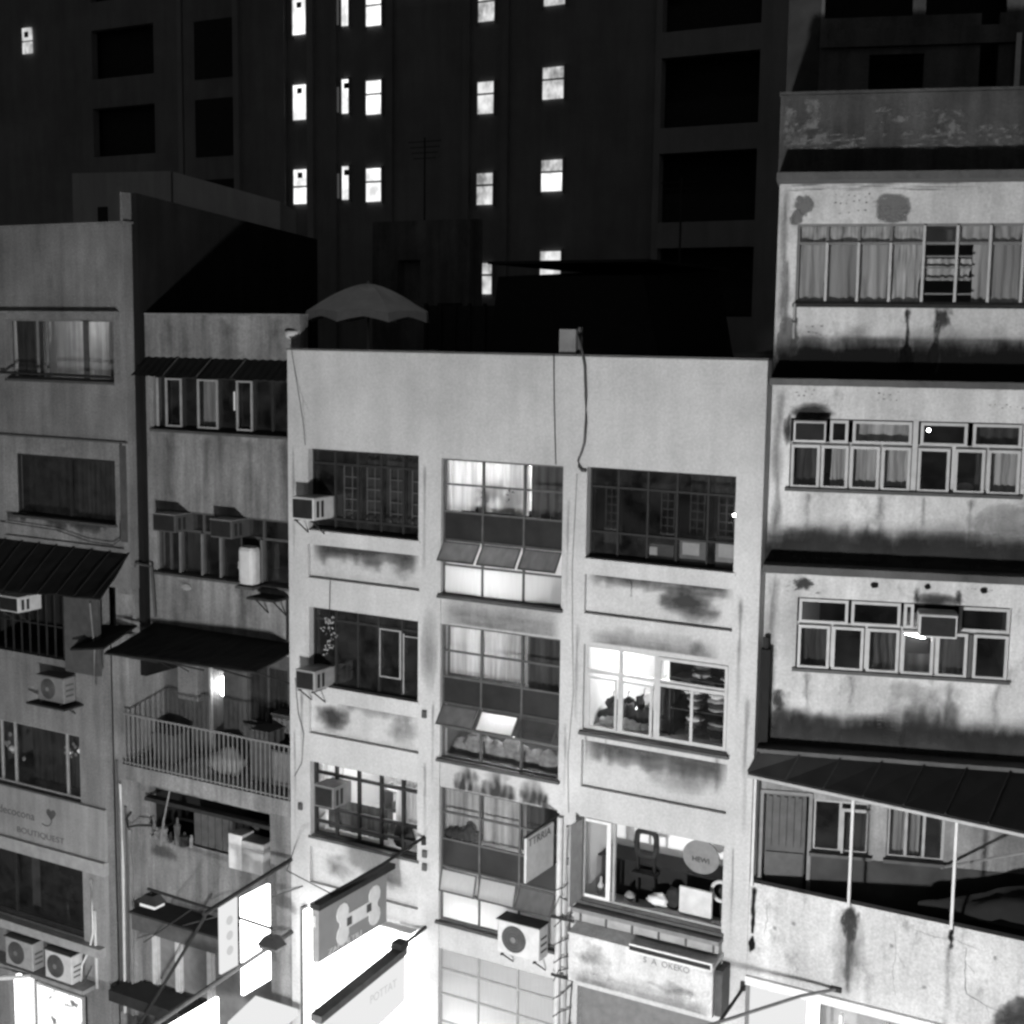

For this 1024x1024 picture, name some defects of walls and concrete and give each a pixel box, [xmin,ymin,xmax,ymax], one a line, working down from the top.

damp [770,339,1024,382]
damp [319,545,414,565]
damp [765,531,1024,573]
damp [596,575,726,617]
damp [321,708,346,728]
damp [768,690,1024,763]
damp [595,742,721,778]
damp [455,770,547,805]